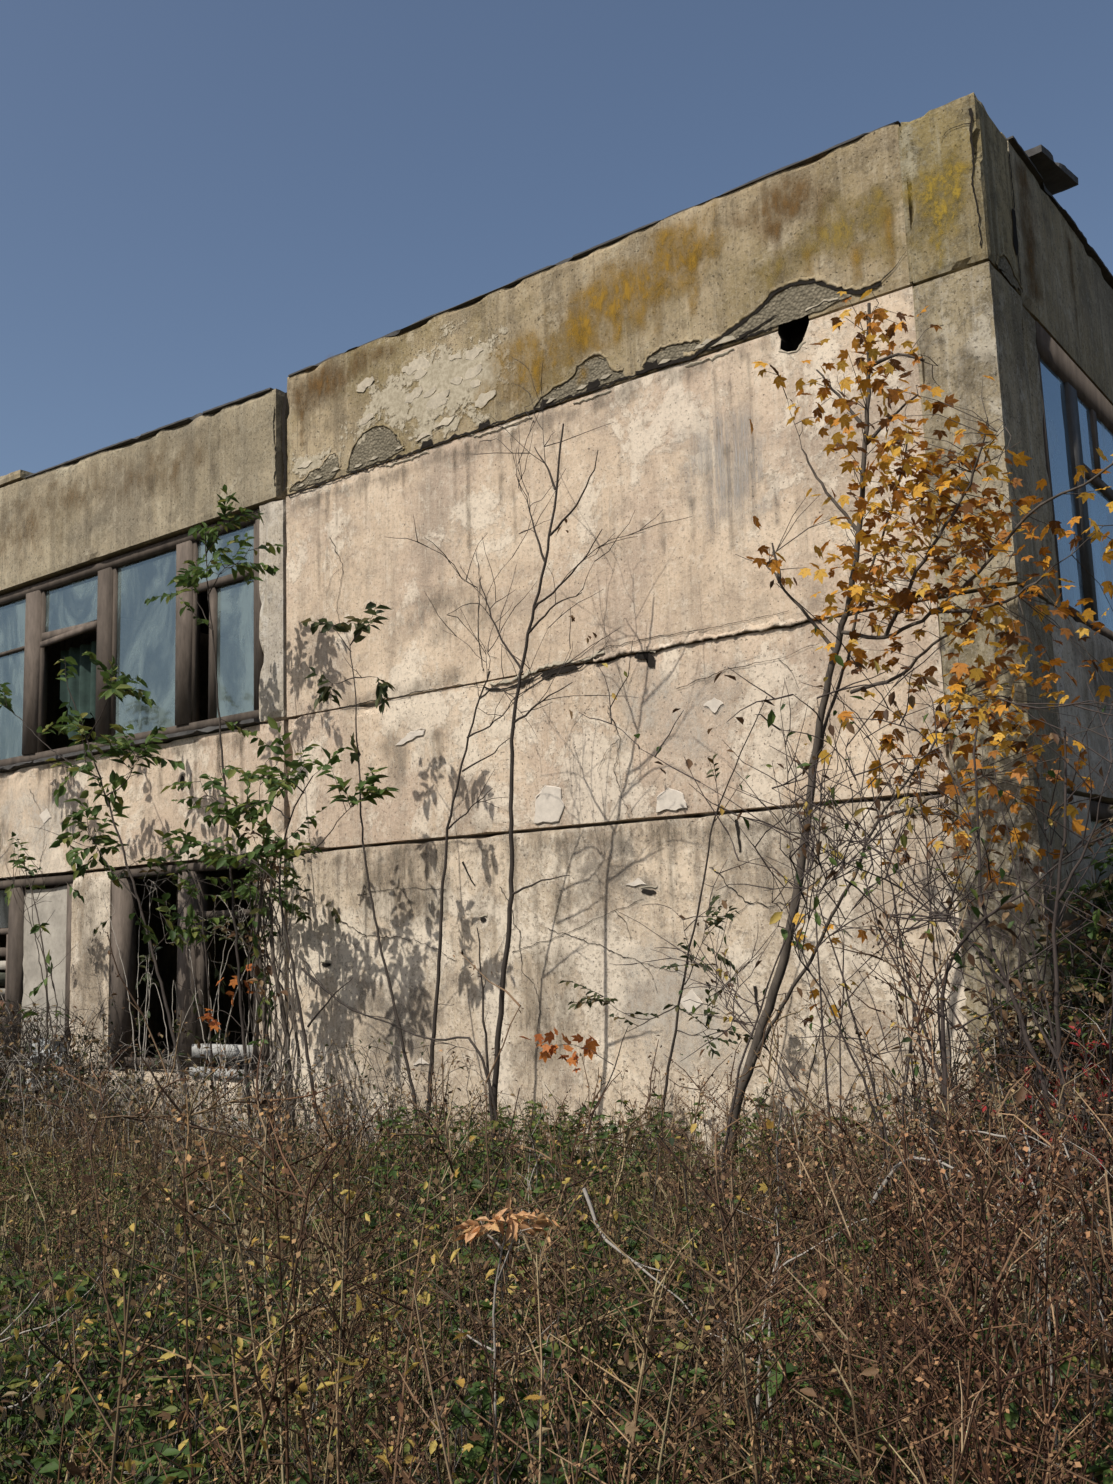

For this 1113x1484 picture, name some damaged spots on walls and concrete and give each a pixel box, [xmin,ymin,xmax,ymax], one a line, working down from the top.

crack [942,108,1023,293]
peeling [287,320,522,491]
spalling [533,350,625,409]
crack [676,643,819,689]
peeling [534,785,564,824]
peeling [656,788,687,813]